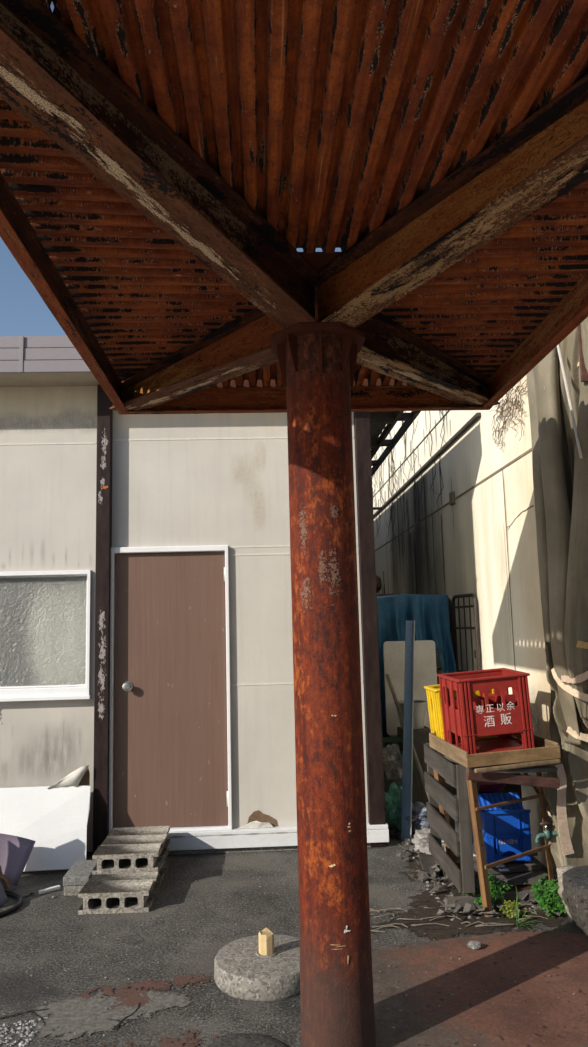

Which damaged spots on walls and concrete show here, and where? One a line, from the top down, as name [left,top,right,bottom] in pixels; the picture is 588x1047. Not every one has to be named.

corrosion [498,0,527,58]
peeling [0,54,276,309]
peeling [443,151,588,249]
peeling [360,358,483,405]
peeling [98,429,108,505]
leakage [386,468,452,594]
peeling [98,607,107,718]